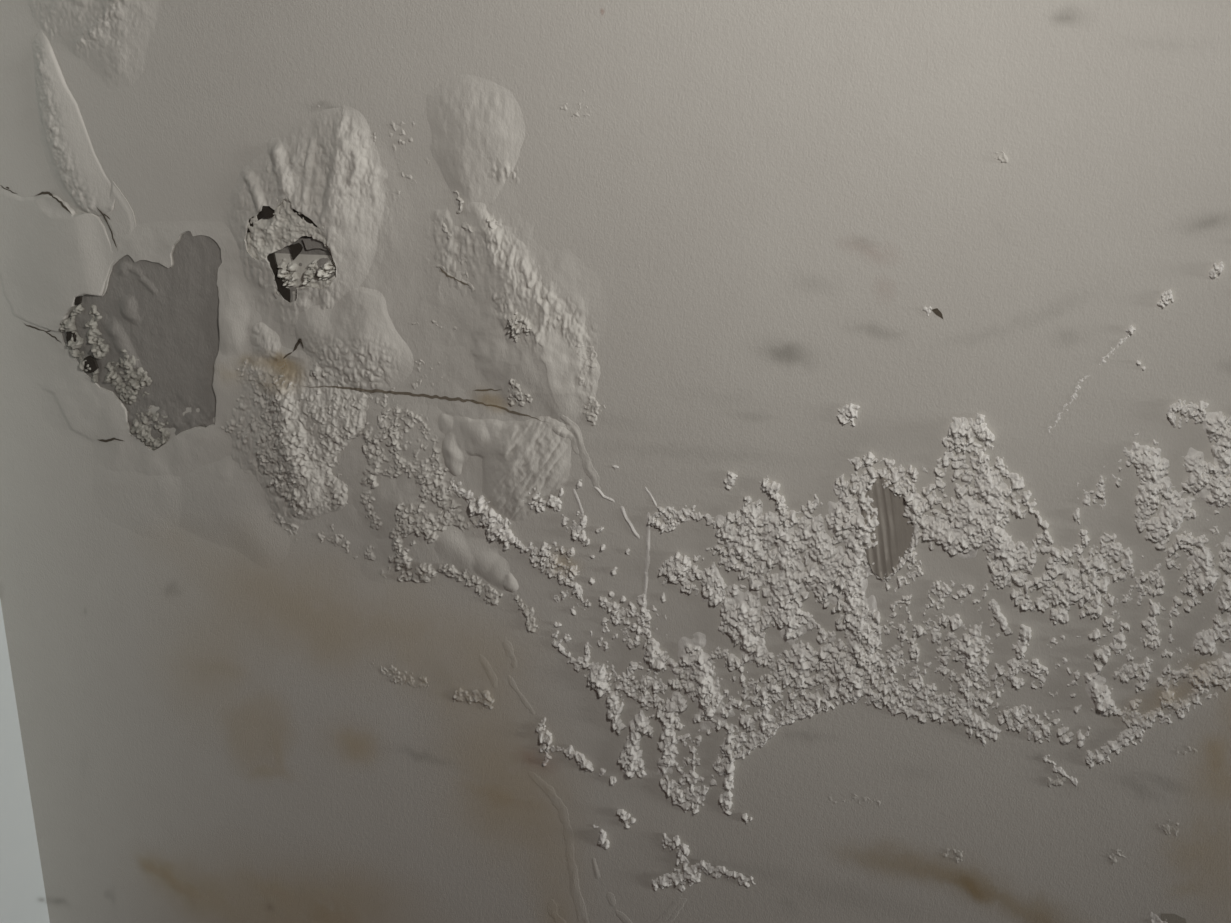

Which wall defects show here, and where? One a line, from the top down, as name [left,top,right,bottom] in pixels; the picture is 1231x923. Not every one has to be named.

spalling [0,181,263,477]
crack [283,338,303,359]
crack [304,386,543,422]
peeling [432,399,1231,823]
peeling [593,825,610,849]
peeling [617,809,636,829]